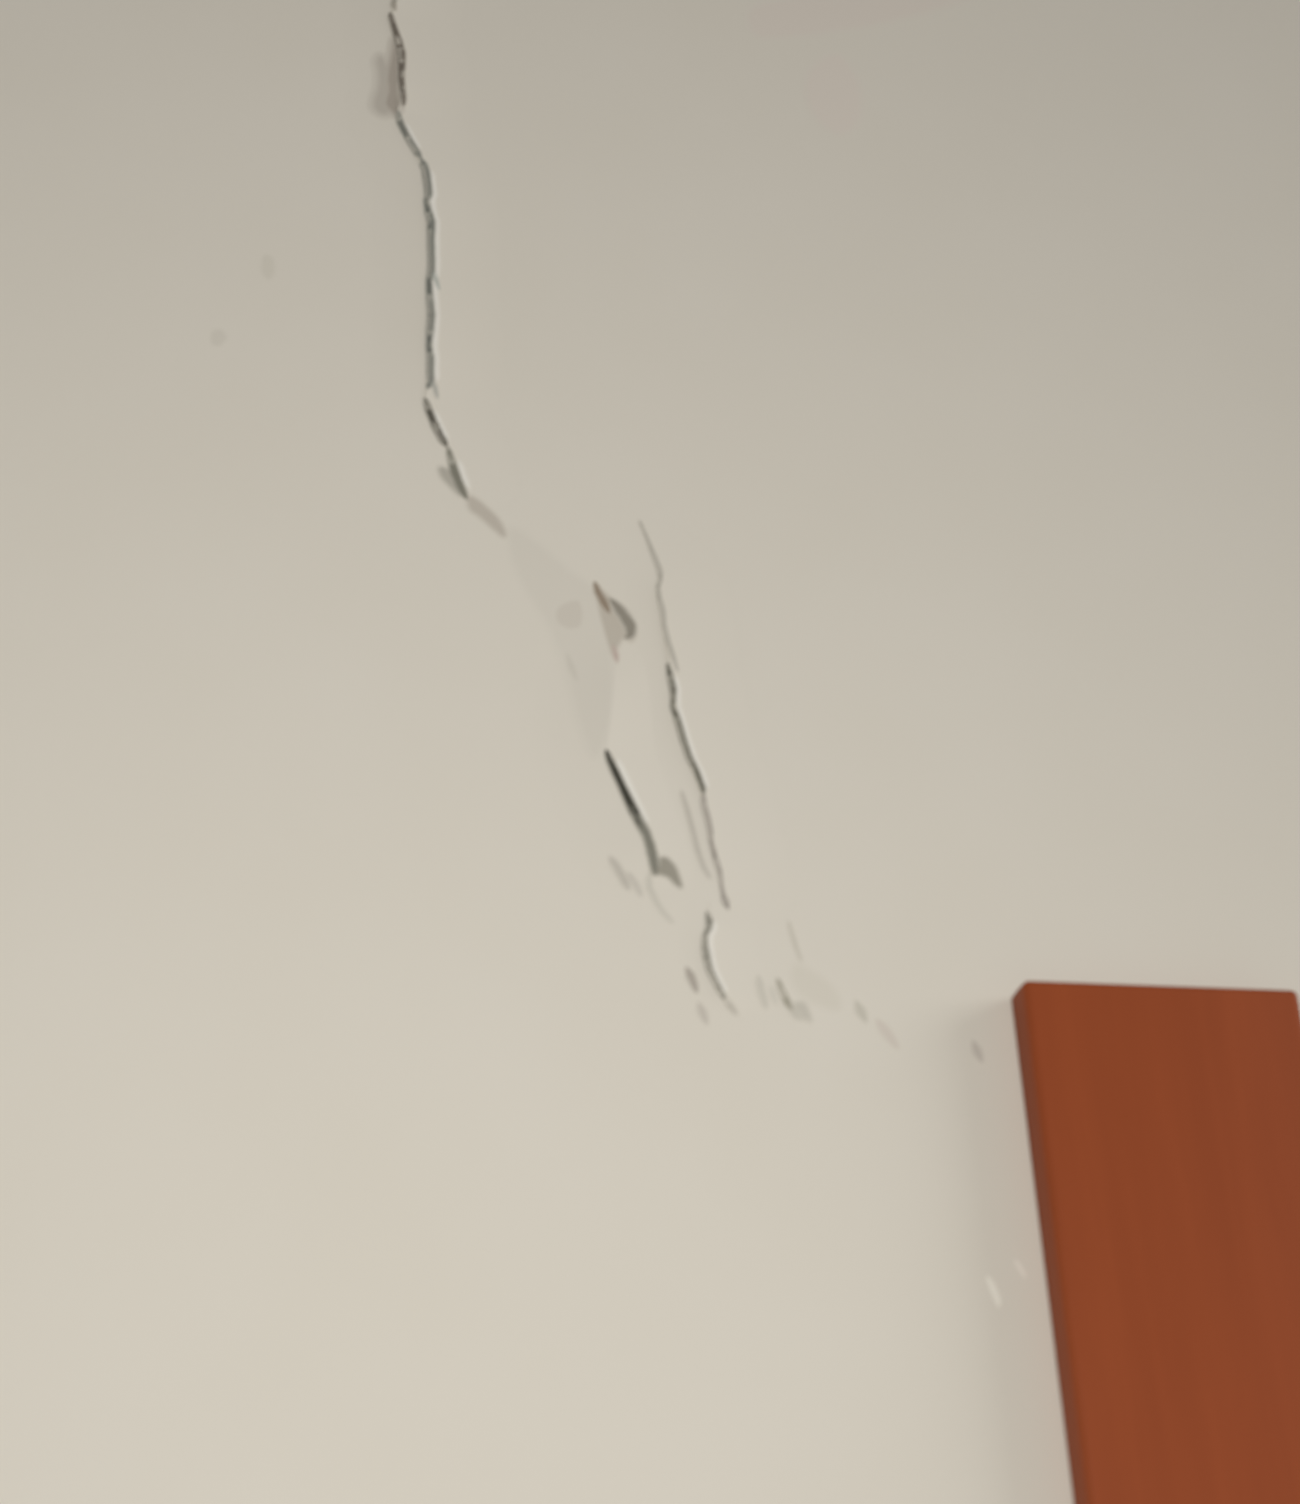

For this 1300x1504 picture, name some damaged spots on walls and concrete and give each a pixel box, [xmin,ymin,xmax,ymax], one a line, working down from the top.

crack [388,0,470,500]
flaking render [592,584,639,657]
crack [593,520,739,1016]
flaking render [649,855,684,889]